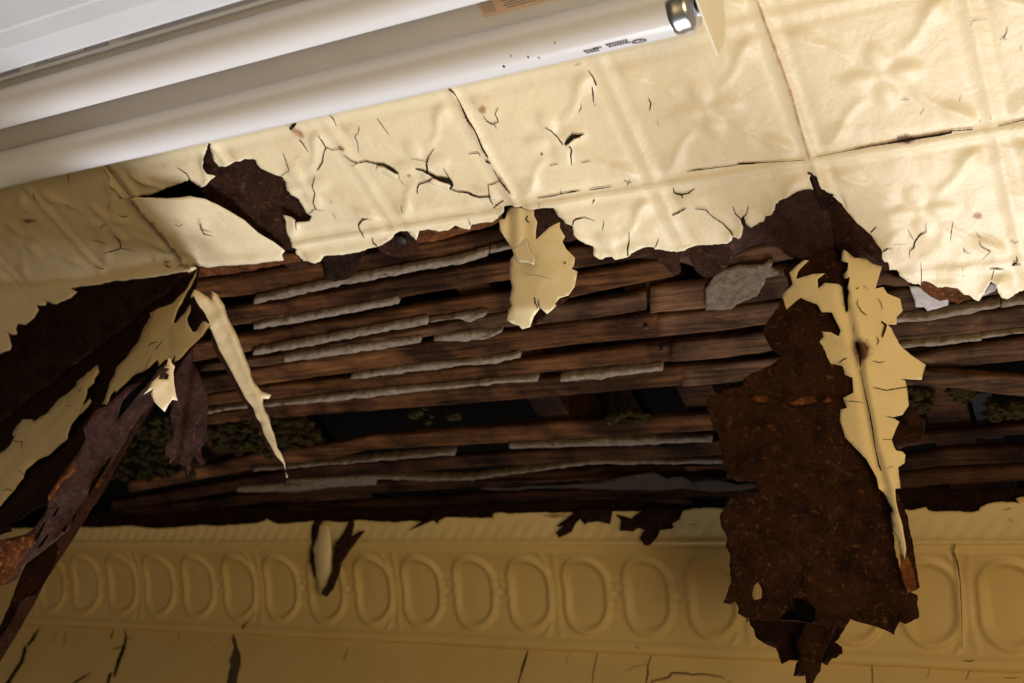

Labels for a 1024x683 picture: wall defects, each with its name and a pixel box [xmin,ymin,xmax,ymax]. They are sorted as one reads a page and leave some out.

crack [541,63,597,166]
peeling [375,166,398,180]
crack [282,89,510,247]
peeling [429,178,450,190]
crack [525,180,631,231]
crack [672,119,1024,236]
peeling [512,239,536,265]
peeling [909,286,949,311]
rust [855,340,869,363]
peeling [143,358,178,412]